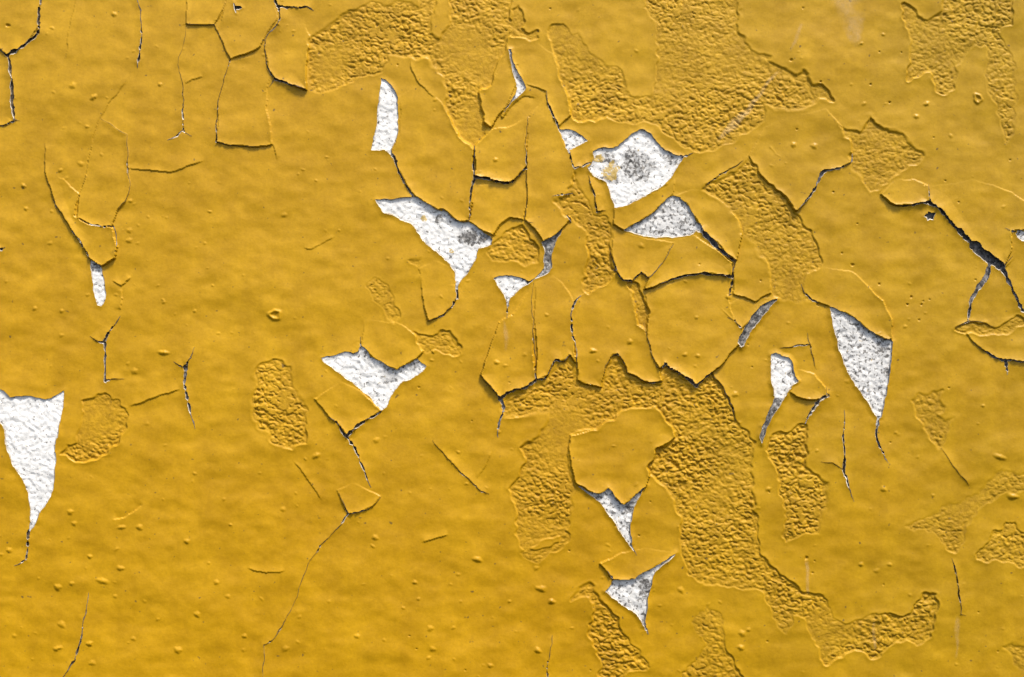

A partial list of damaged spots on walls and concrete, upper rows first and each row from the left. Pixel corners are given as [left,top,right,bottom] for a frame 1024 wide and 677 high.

crack [0,0,42,126]
peeling [0,387,129,566]
peeling [44,121,202,309]
spalling [252,359,323,500]
crack [260,399,382,677]
crack [469,119,533,236]
crack [432,283,580,494]
spalling [305,0,940,677]
crack [645,245,743,387]
crack [703,134,853,211]
crack [782,333,854,500]
crack [881,184,1024,375]